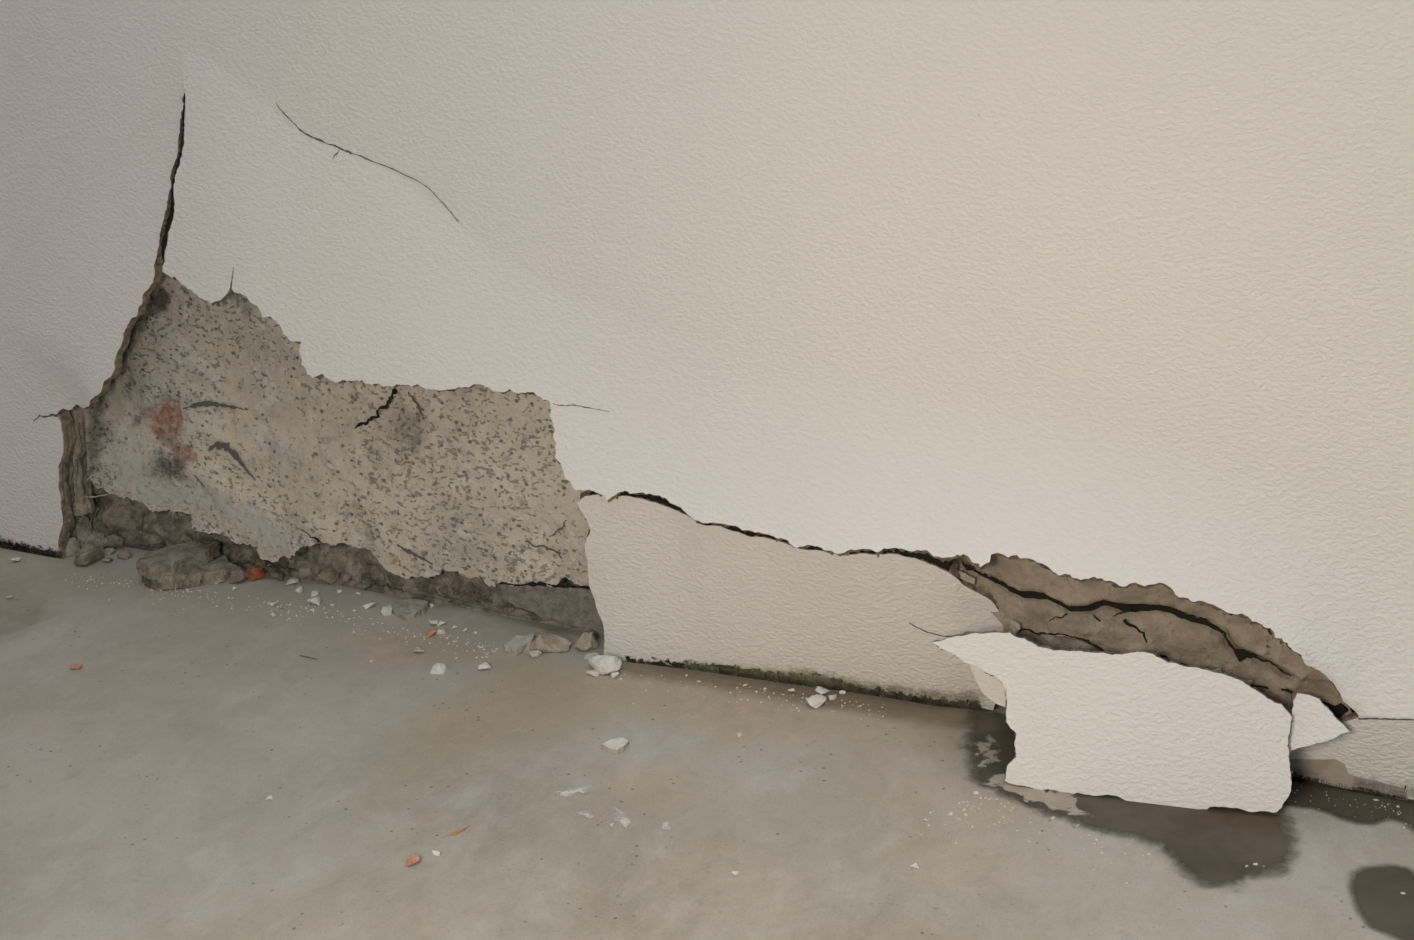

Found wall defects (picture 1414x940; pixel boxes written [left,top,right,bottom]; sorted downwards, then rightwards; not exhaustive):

crack [161,93,185,260]
crack [276,103,459,222]
spalling [49,201,604,636]
spalling [806,686,831,708]
water stain [619,656,1414,886]
spalling [952,555,1355,719]
peeling [1289,759,1407,801]
water stain [1351,865,1414,940]